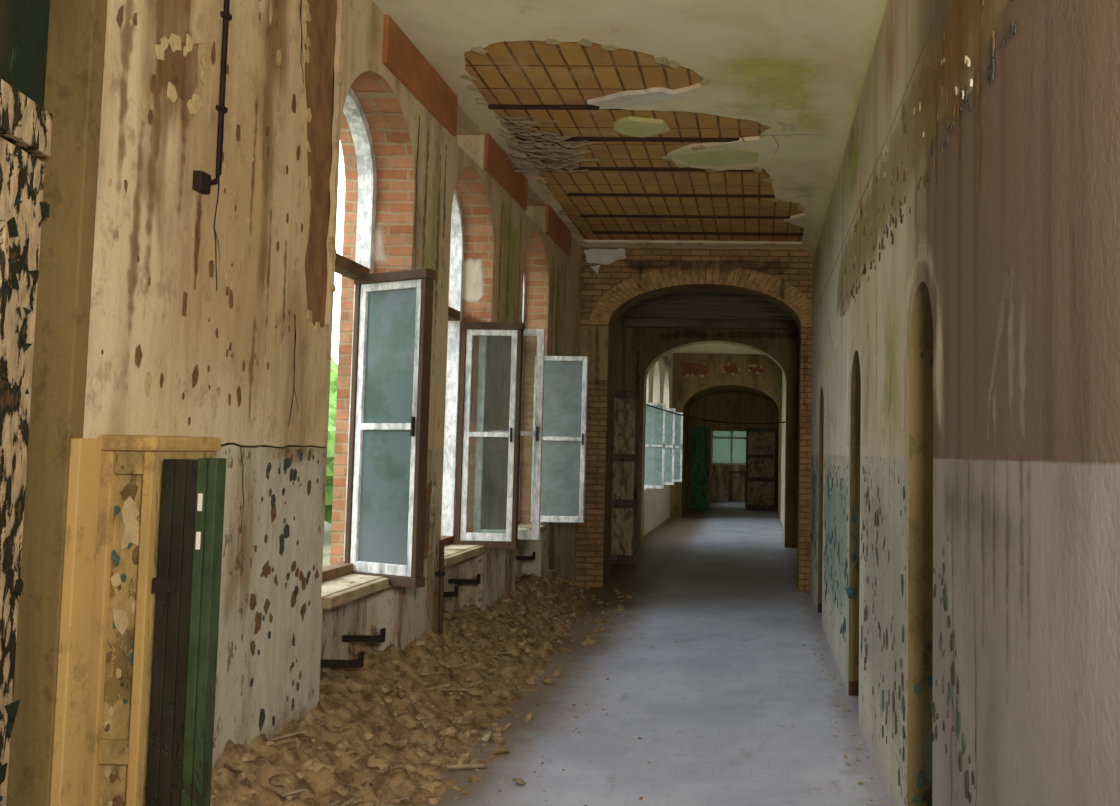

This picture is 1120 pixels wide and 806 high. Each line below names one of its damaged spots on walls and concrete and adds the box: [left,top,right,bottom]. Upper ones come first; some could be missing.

peeling [7,199,23,238]
peeling [34,187,50,219]
water stain [121,0,133,121]
water stain [129,0,191,311]
water stain [250,0,284,230]
flaking render [460,37,807,246]
peeling [843,21,1017,314]
peeling [0,700,20,737]
peeling [106,601,136,678]
peeling [111,484,140,591]
peeling [248,449,320,746]
peeling [810,459,976,806]